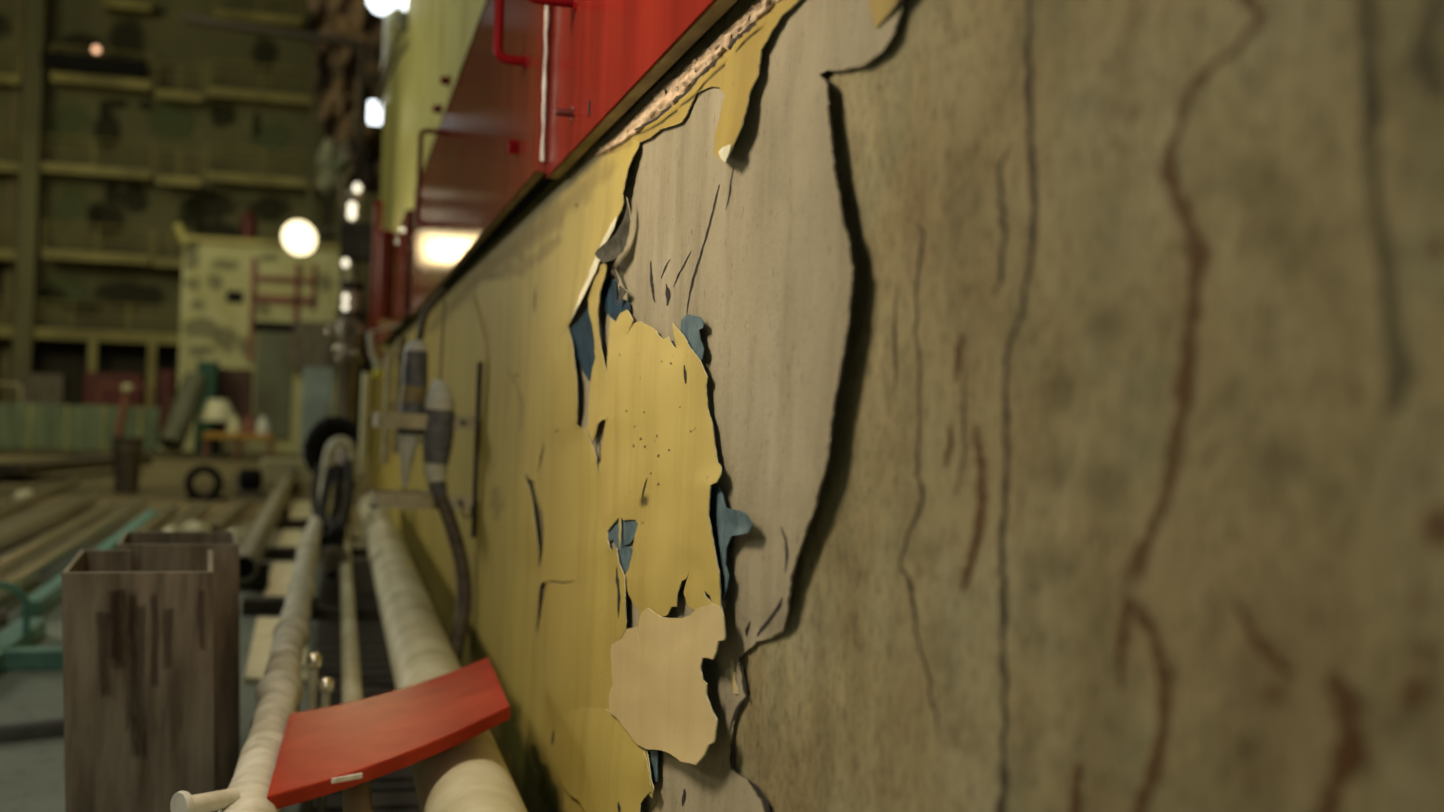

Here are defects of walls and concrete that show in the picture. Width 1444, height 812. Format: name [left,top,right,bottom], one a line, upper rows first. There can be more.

flaking render [369,0,907,812]